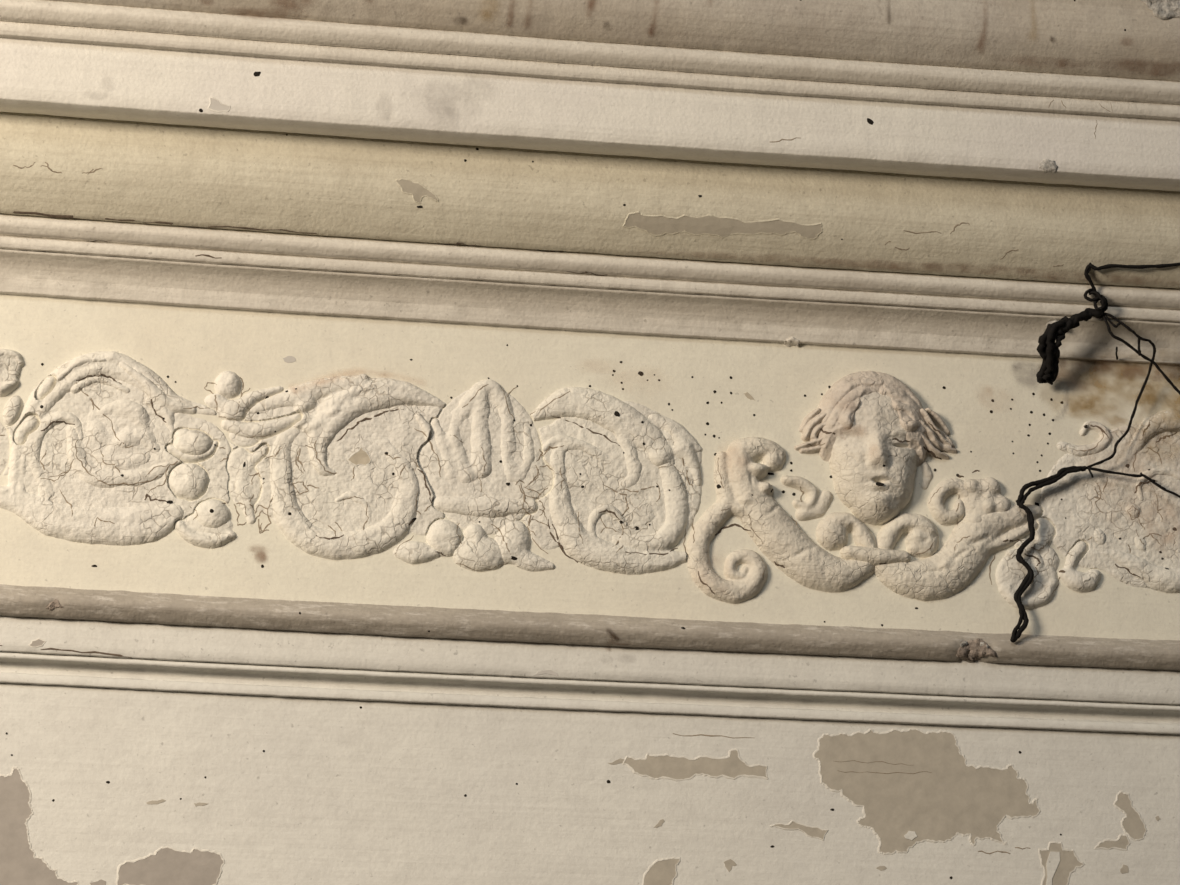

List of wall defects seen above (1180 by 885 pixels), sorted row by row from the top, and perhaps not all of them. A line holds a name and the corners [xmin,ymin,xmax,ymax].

flaking render [1141,0,1180,20]
peeling [622,211,823,240]
crack [40,374,785,594]
peeling [609,748,768,782]
peeling [813,728,1041,871]
peeling [0,766,225,885]
peeling [1094,791,1160,874]
peeling [642,857,681,885]
peeling [1038,841,1085,885]